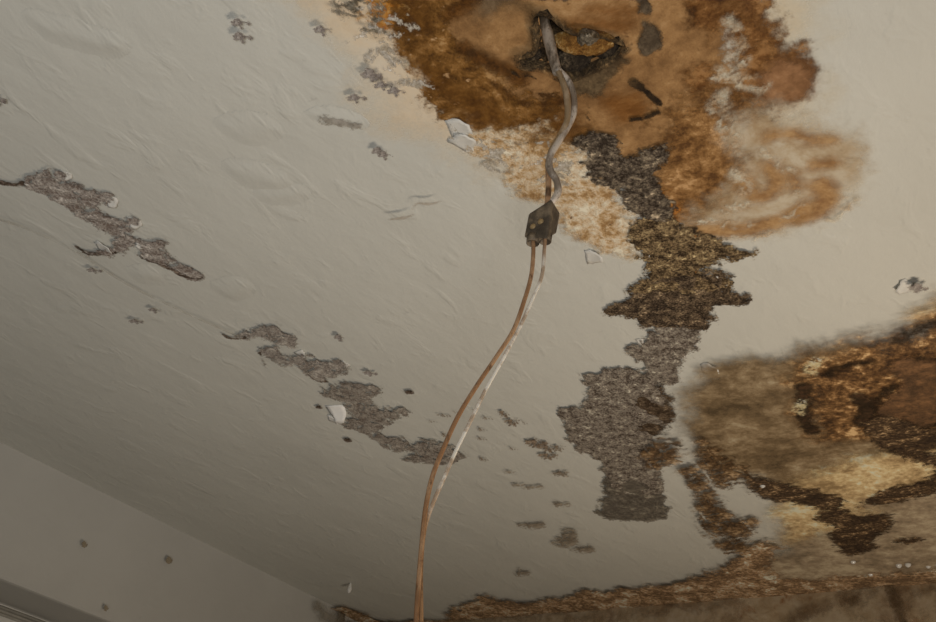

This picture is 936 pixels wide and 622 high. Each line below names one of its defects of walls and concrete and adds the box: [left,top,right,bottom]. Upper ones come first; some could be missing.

water stain [347,0,435,89]
corrosion [298,0,863,261]
water stain [708,60,770,152]
peeling [0,168,204,282]
water stain [698,169,753,226]
spalling [525,130,759,523]
peeling [222,325,466,465]
water stain [409,303,936,622]
peeling [552,529,595,553]